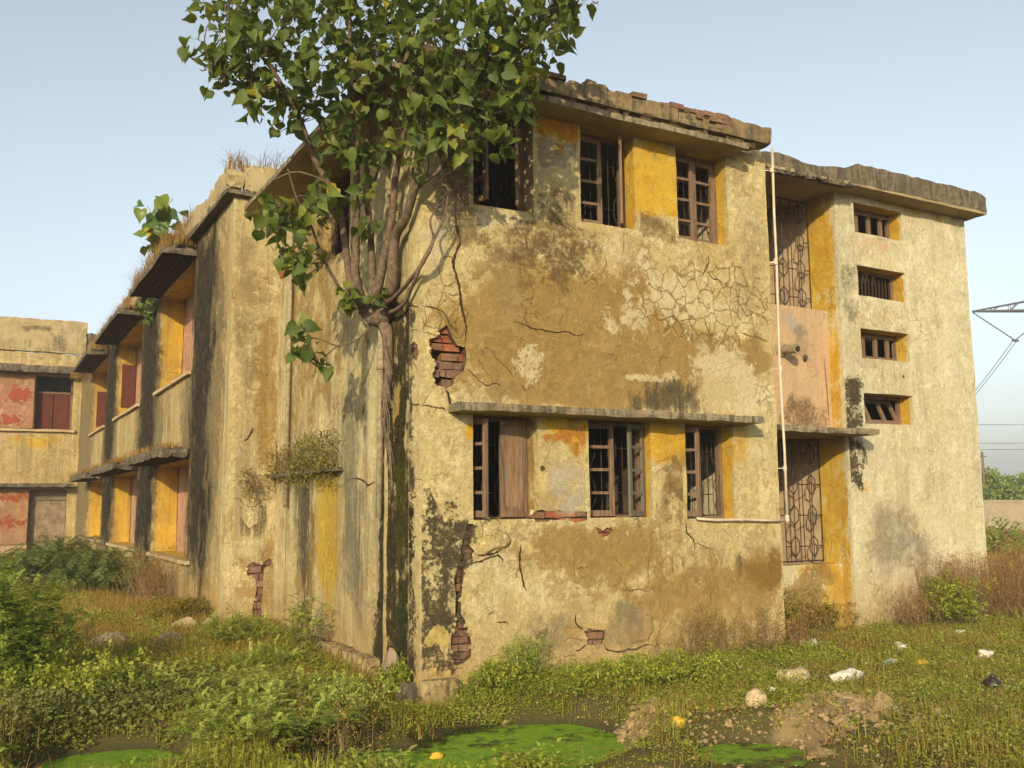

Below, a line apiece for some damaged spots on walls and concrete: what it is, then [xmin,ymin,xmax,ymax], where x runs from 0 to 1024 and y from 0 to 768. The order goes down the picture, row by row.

crack [407,207,514,386]
crack [514,307,585,336]
spalling [408,326,470,388]
peeling [511,343,546,388]
leakage [185,223,216,600]
leakage [845,374,867,490]
leakage [371,304,478,681]
spalling [525,509,611,540]
spalling [246,558,274,619]
crack [468,545,527,591]
spalling [429,618,474,678]
crack [476,615,657,666]